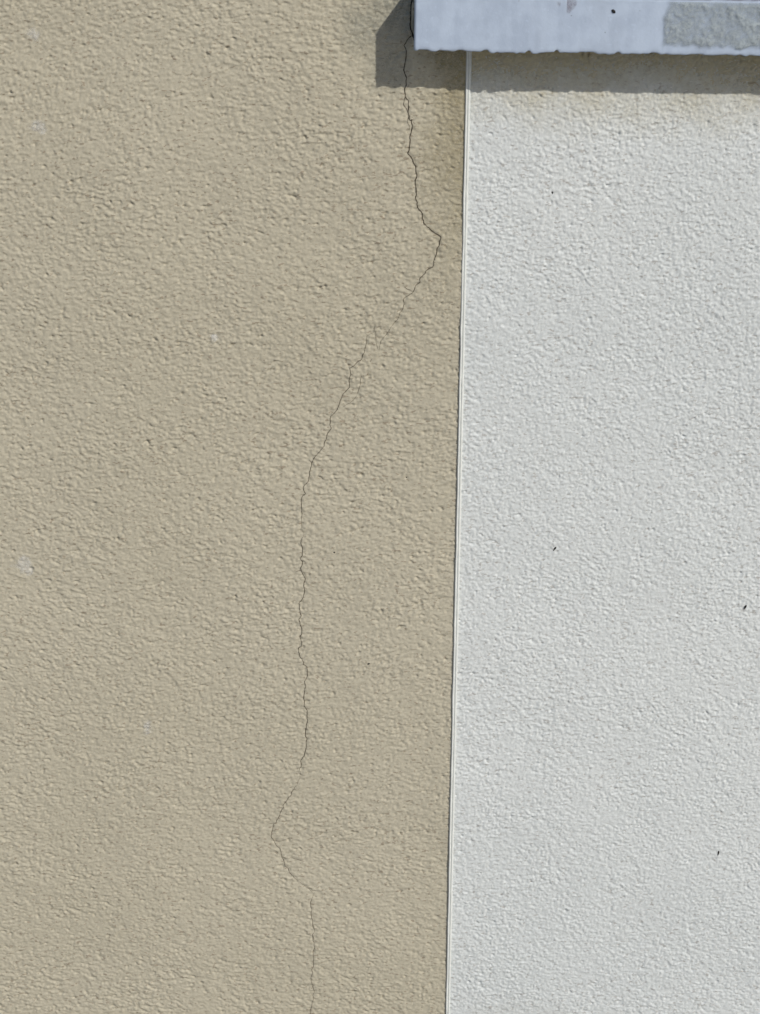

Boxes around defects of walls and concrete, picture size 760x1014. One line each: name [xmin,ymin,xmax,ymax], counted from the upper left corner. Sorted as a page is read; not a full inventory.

crack [271,0,441,1014]